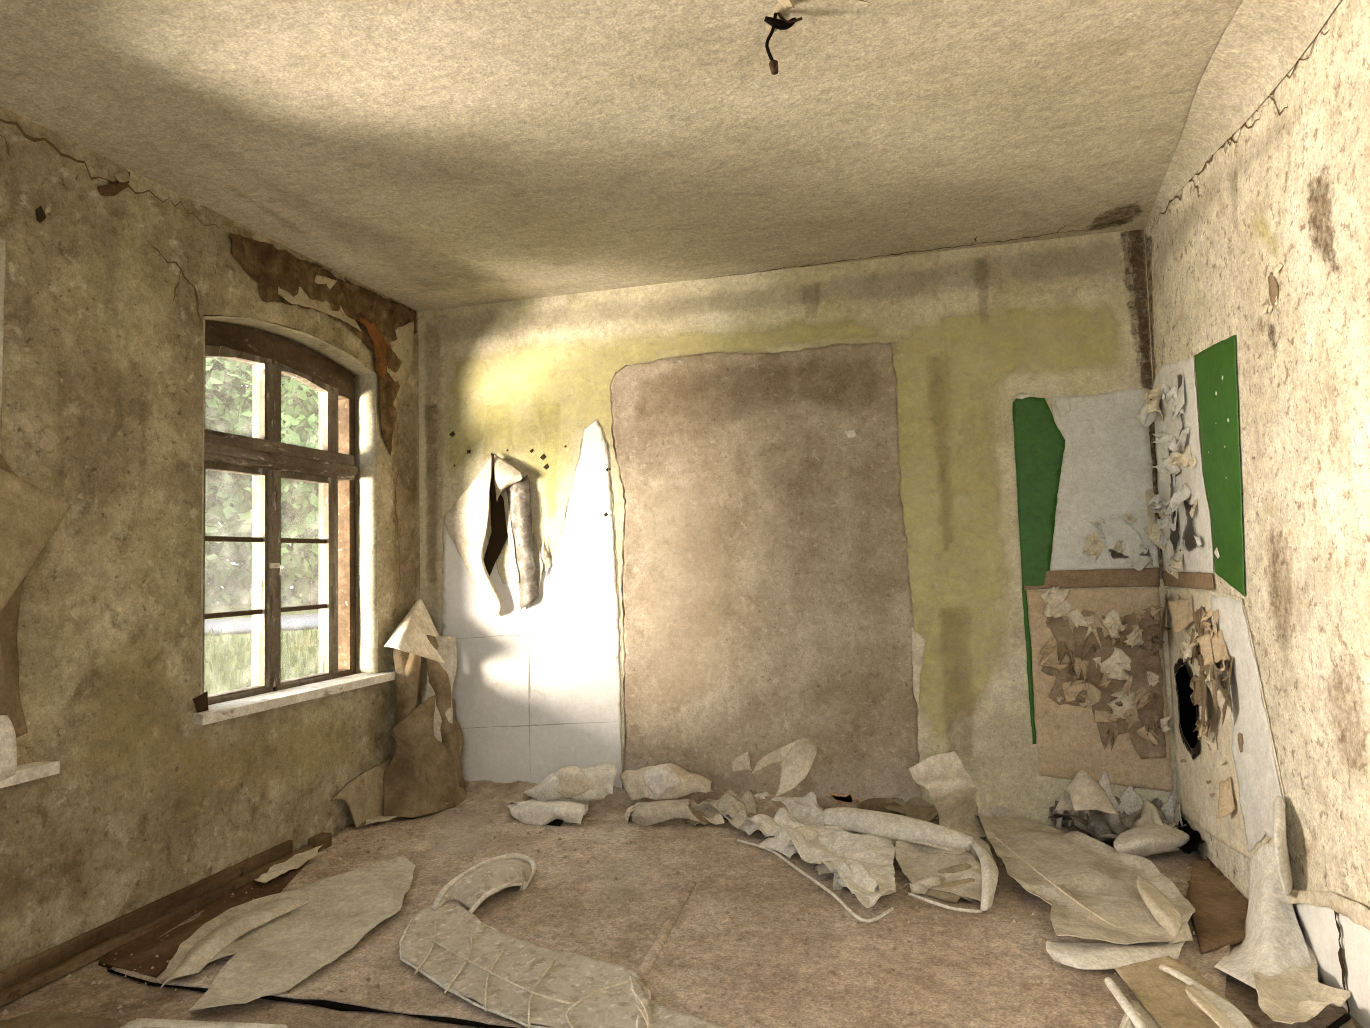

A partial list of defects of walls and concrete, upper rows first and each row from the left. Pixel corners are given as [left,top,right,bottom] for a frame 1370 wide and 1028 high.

crack [0,119,220,229]
crack [706,30,1329,279]
leakage [1309,169,1338,271]
crack [147,240,201,327]
spalling [229,233,417,456]
leakage [1090,204,1155,400]
leakage [1149,422,1158,495]
peeling [533,532,551,588]
peeling [1011,335,1293,897]